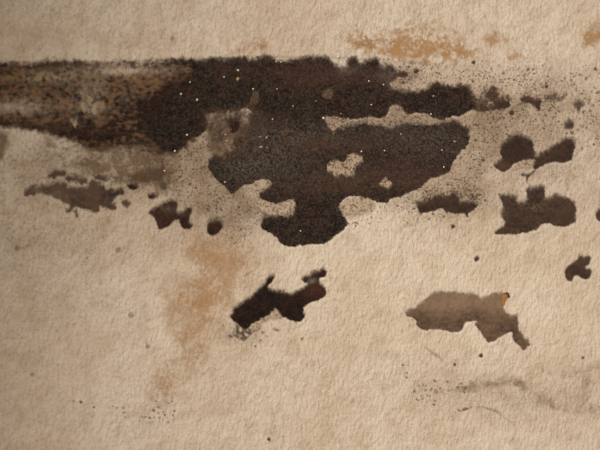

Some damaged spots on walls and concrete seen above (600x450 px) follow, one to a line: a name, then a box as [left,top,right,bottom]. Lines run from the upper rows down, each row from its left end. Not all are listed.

leakage [0,55,600,247]
leakage [565,256,591,281]
leakage [230,269,327,340]
leakage [406,291,530,350]